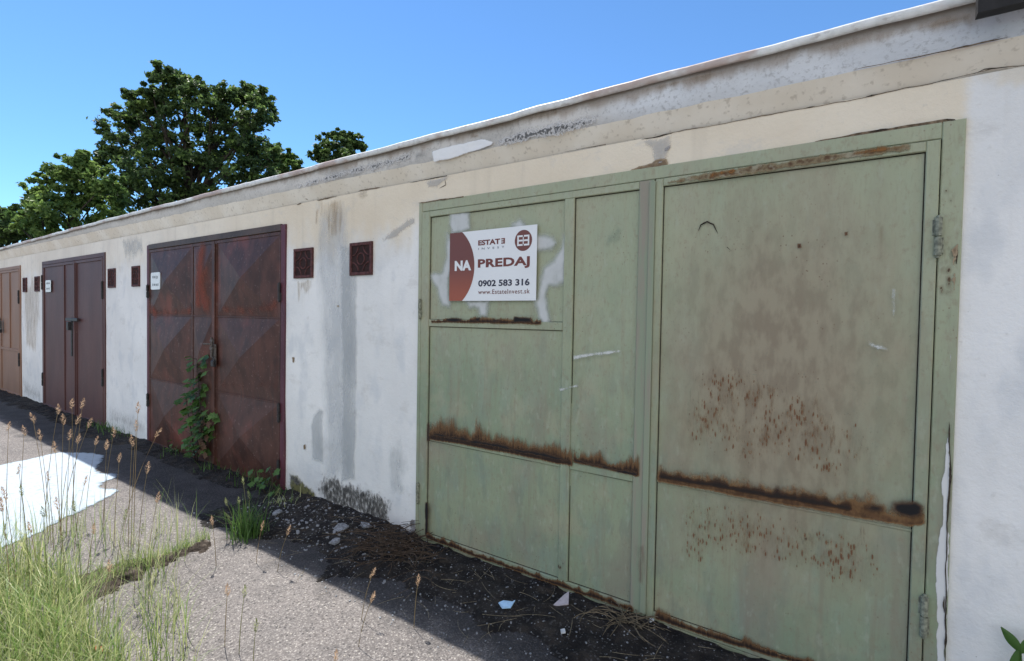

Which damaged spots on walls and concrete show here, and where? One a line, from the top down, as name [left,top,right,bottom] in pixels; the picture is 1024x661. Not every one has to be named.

corrosion [668,144,910,183]
corrosion [431,316,541,325]
damp [318,422,388,520]
corrosion [427,418,639,477]
corrosion [688,375,857,472]
corrosion [425,502,633,612]
corrosion [657,466,925,584]
peeling [936,438,950,661]